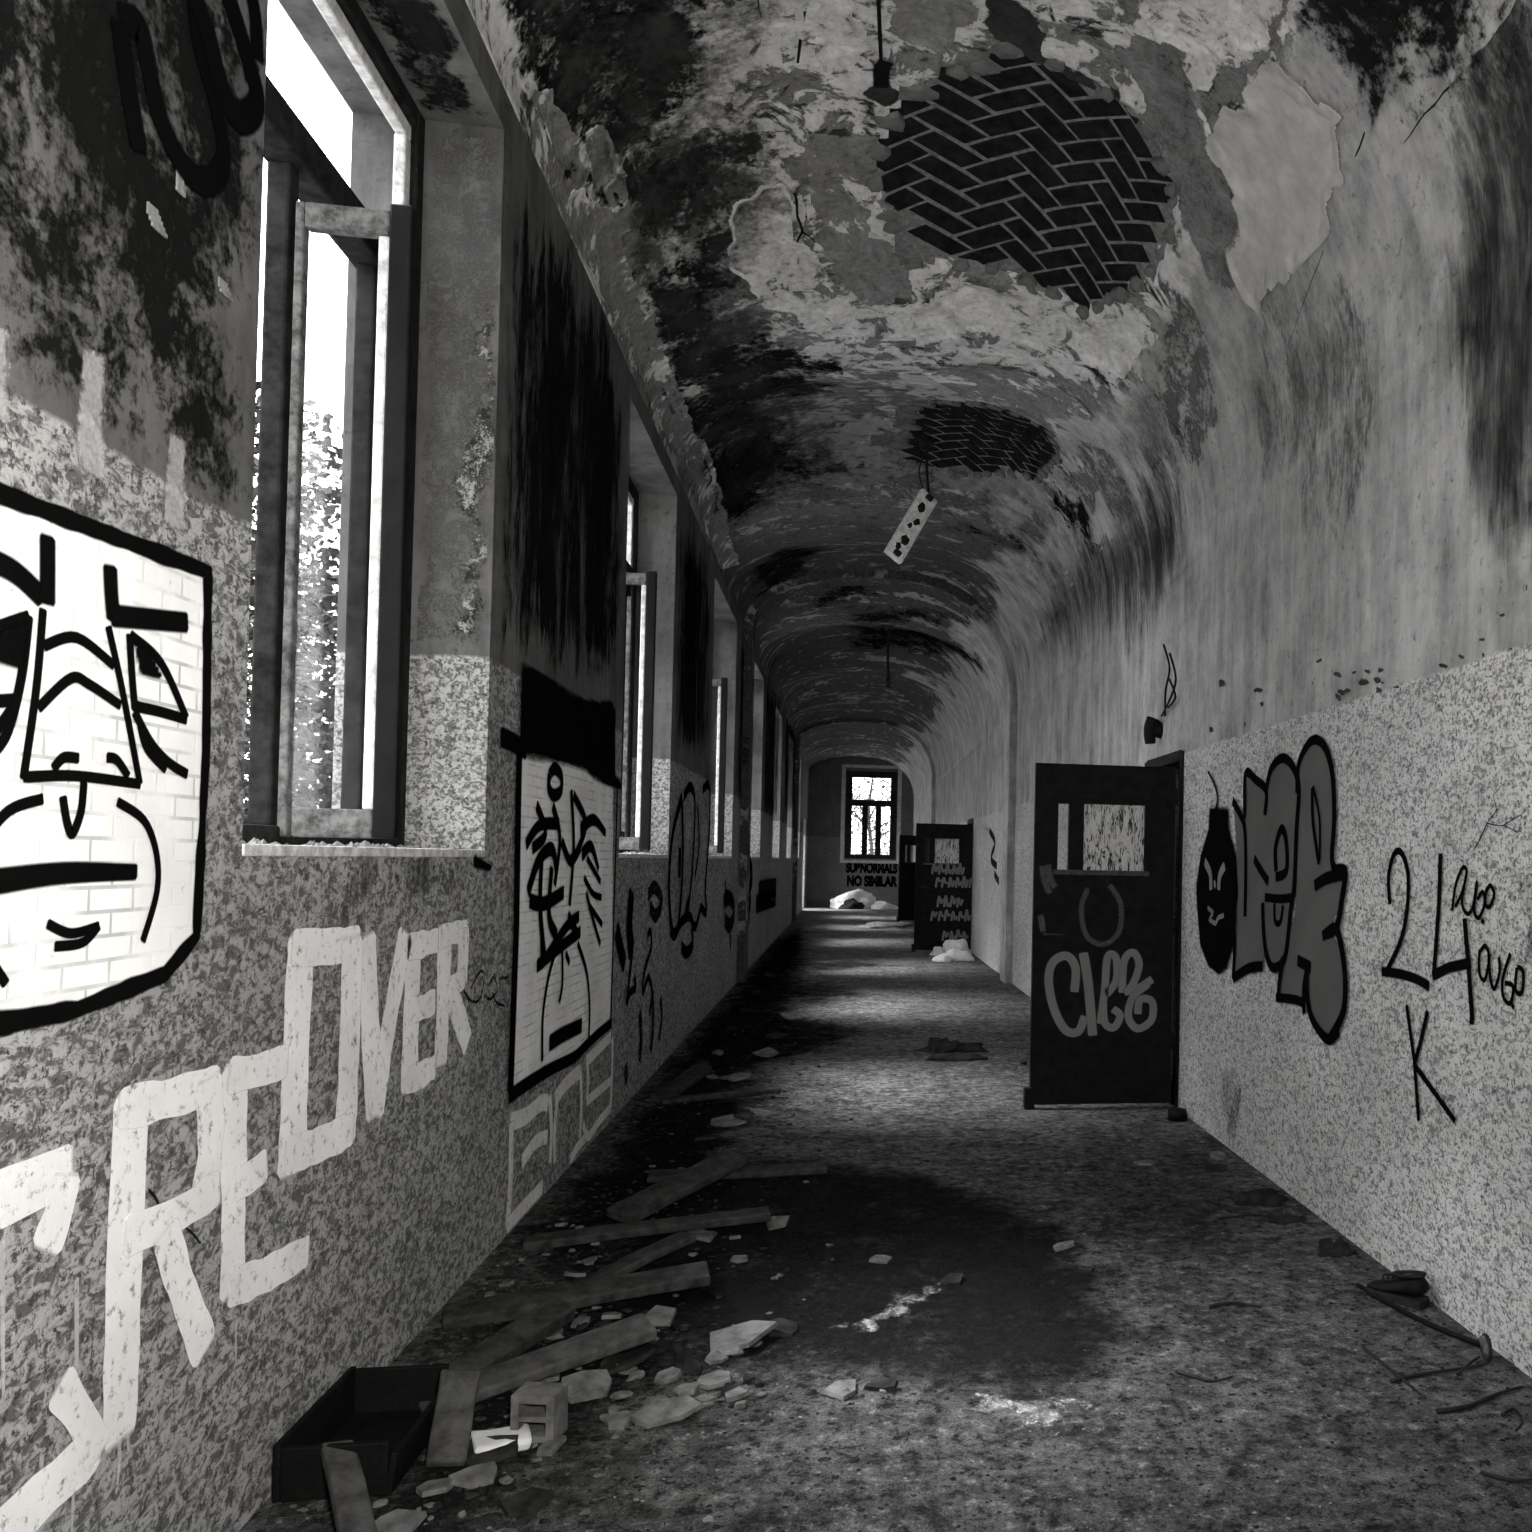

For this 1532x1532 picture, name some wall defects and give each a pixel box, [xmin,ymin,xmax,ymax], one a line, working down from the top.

leakage [0,0,265,499]
peeling [359,0,486,116]
leakage [502,181,622,677]
leakage [526,0,842,509]
flaking render [502,0,1344,570]
leakage [1257,281,1372,515]
leakage [1295,0,1532,547]